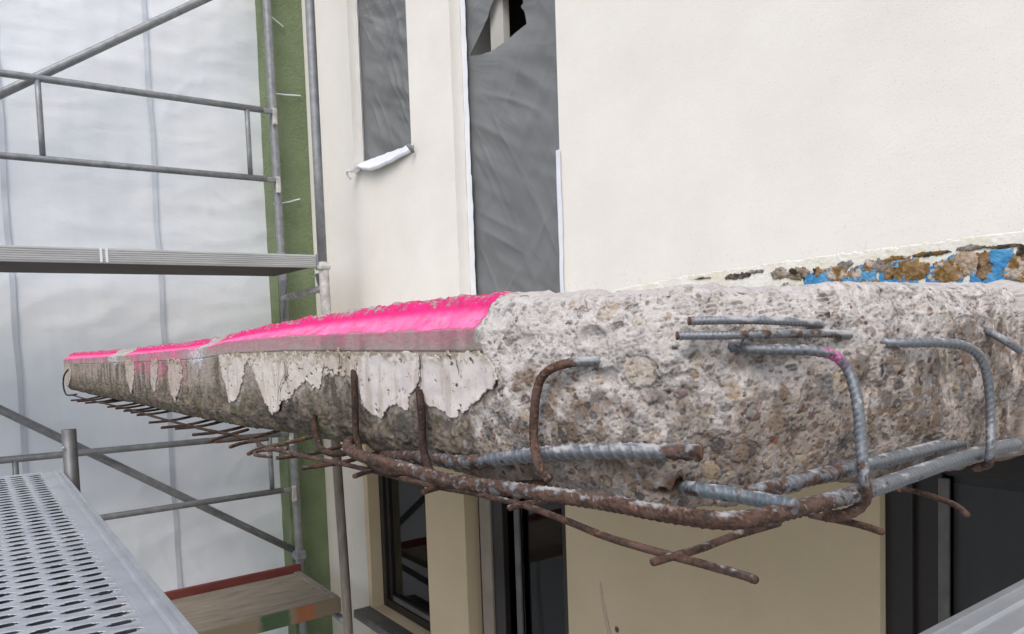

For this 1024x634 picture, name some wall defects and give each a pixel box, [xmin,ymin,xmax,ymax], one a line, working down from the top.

spalling [65,229,1024,508]